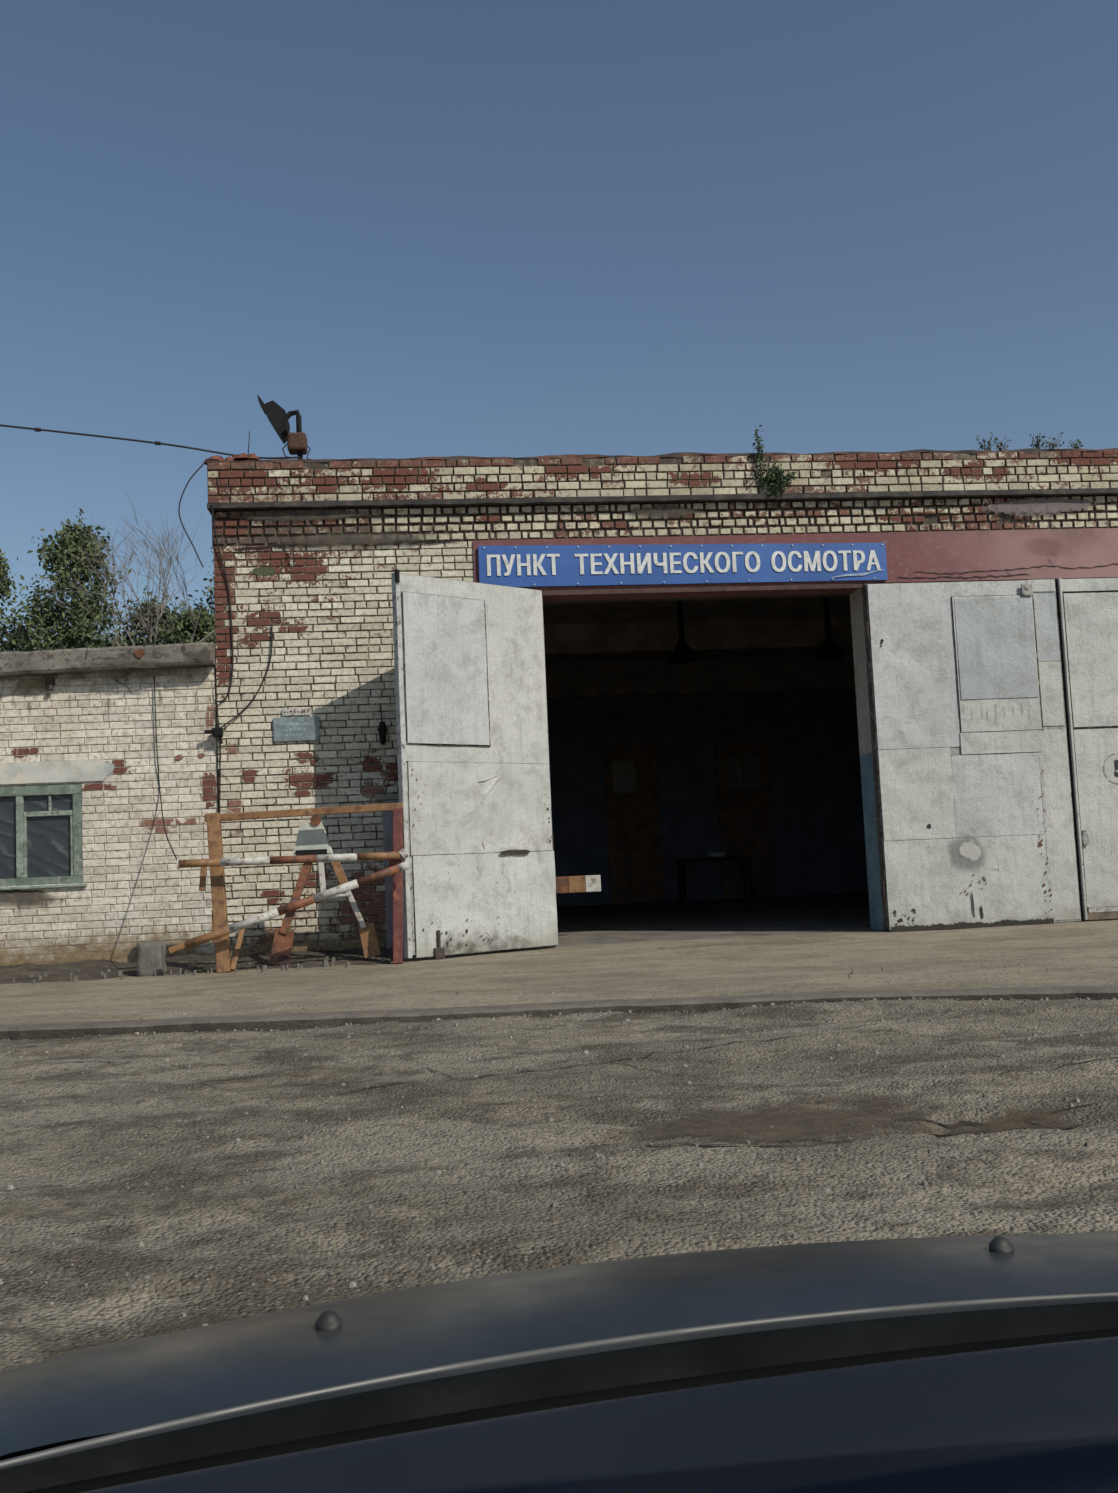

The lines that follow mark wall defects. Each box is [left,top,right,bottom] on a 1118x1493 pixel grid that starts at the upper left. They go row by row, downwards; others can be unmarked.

peeling [204,453,440,494]
peeling [460,476,508,498]
peeling [539,458,620,481]
peeling [668,472,721,527]
peeling [870,460,1016,530]
peeling [1052,451,1118,465]
peeling [255,549,331,587]
peeling [93,511,308,833]
peeling [282,752,342,796]